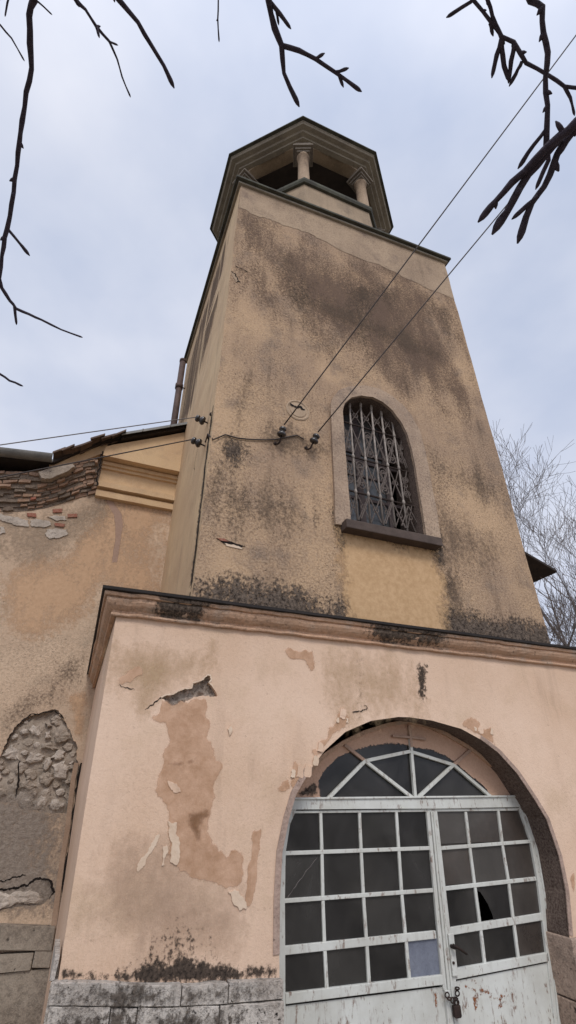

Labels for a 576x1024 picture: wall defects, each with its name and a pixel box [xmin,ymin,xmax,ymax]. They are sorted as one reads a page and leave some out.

leakage [238,214,472,423]
flaking render [0,500,123,562]
spalling [216,538,243,549]
peeling [285,648,314,670]
leakage [417,663,428,697]
flaking render [0,709,79,814]
peeling [145,674,261,910]
peeling [279,708,349,791]
flaking render [0,877,55,910]
leakage [144,929,211,970]